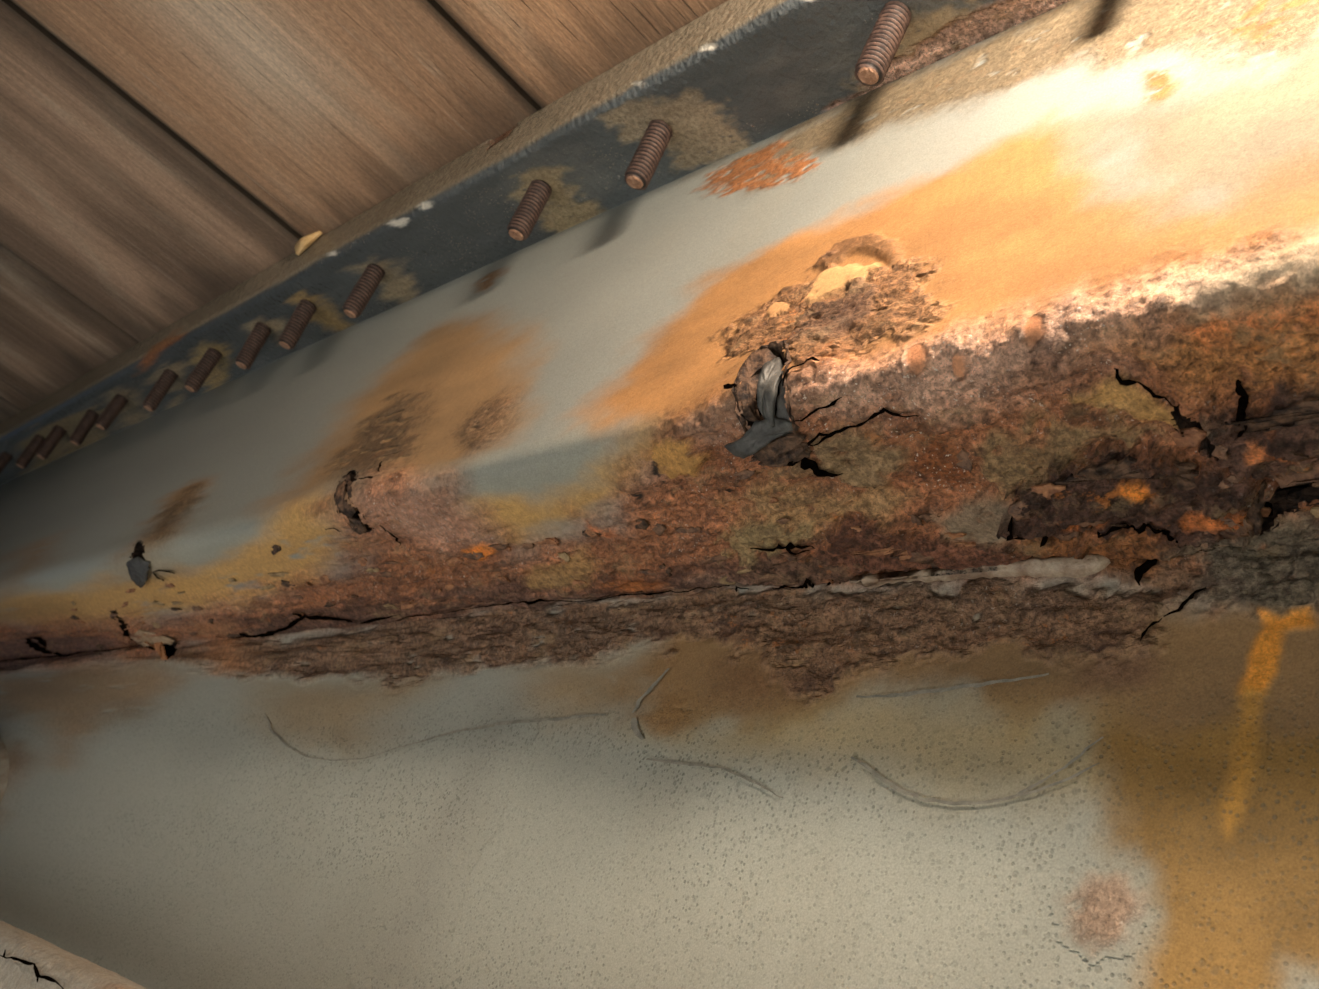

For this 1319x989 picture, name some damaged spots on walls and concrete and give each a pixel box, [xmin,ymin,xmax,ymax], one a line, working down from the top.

peeling [808,262,877,299]
peeling [459,415,634,501]
corrosion [0,0,1319,777]
crack [787,397,919,477]
peeling [1072,378,1182,435]
crack [1114,368,1178,408]
crack [1235,379,1249,438]
peeling [714,433,907,570]
peeling [148,505,274,574]
crack [1097,523,1178,585]
corrosion [166,500,1319,847]
crack [0,950,64,989]